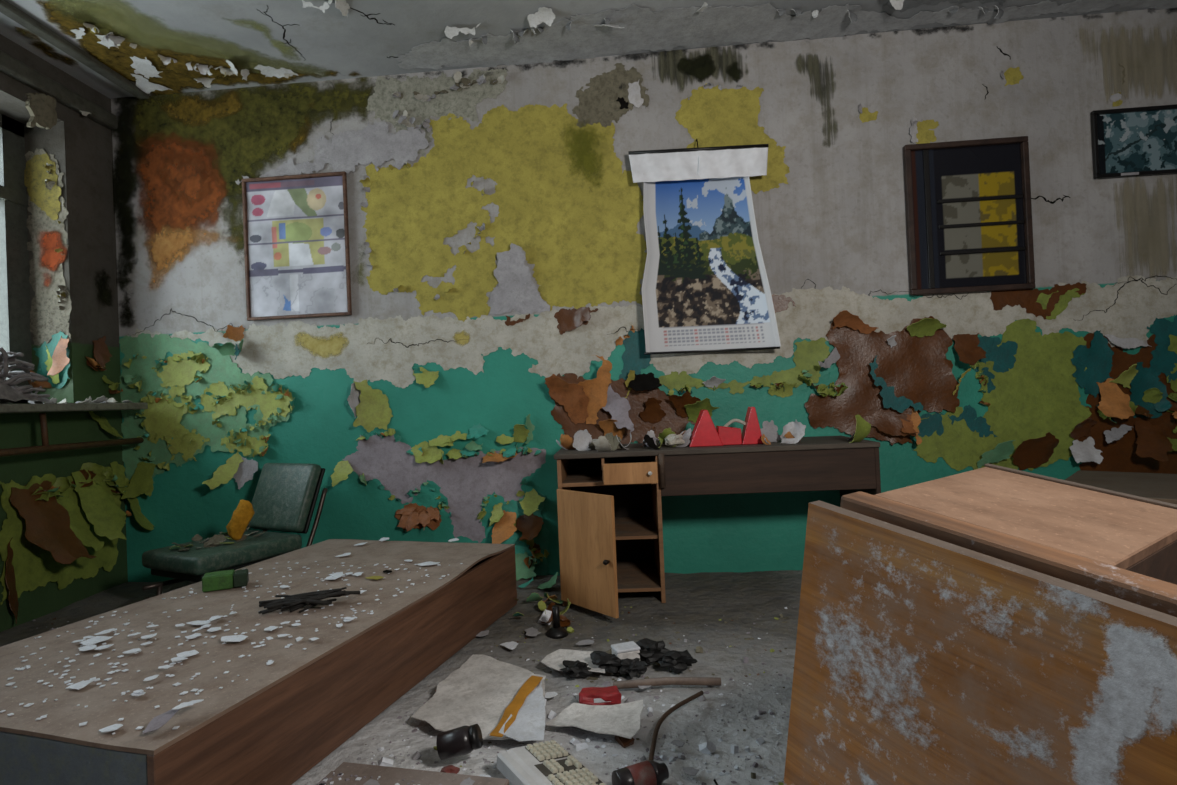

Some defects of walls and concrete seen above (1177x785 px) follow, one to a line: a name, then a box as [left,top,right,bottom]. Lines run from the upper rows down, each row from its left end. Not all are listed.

crack [258,6,306,61]
crack [351,8,394,25]
damp [627,45,742,90]
damp [797,55,836,145]
peeling [0,0,1177,624]